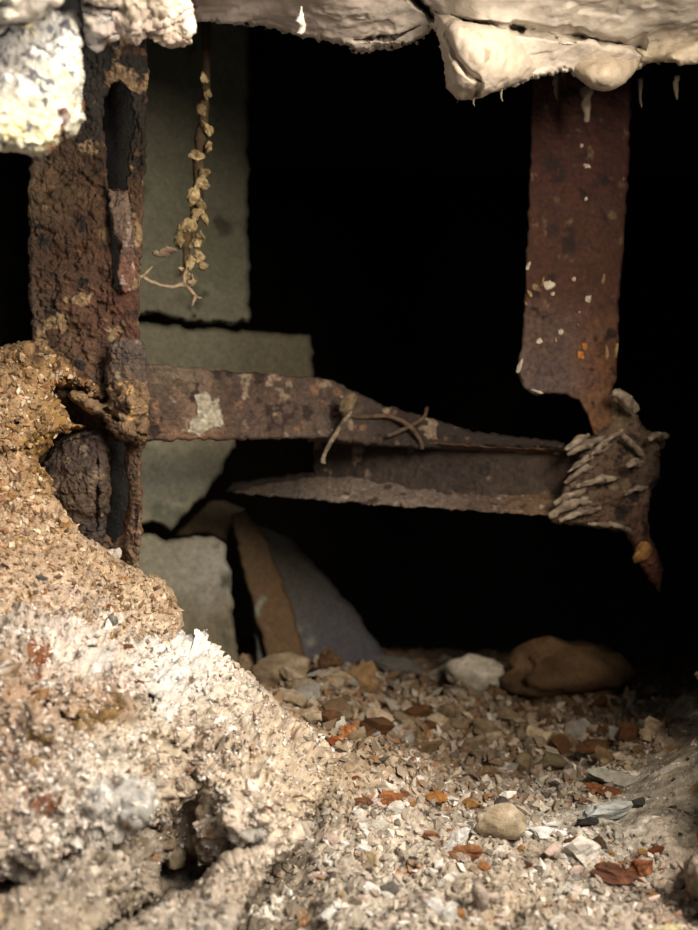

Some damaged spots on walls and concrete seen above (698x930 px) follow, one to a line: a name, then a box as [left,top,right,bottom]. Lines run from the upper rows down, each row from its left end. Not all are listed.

peeling [0,0,20,22]
flaking render [79,0,197,53]
flaking render [295,6,306,35]
crack [415,0,492,24]
crack [522,27,599,41]
corrosion [46,107,70,151]
corrosion [108,189,137,294]
corrosion [34,344,98,392]
corrosion [123,442,143,568]